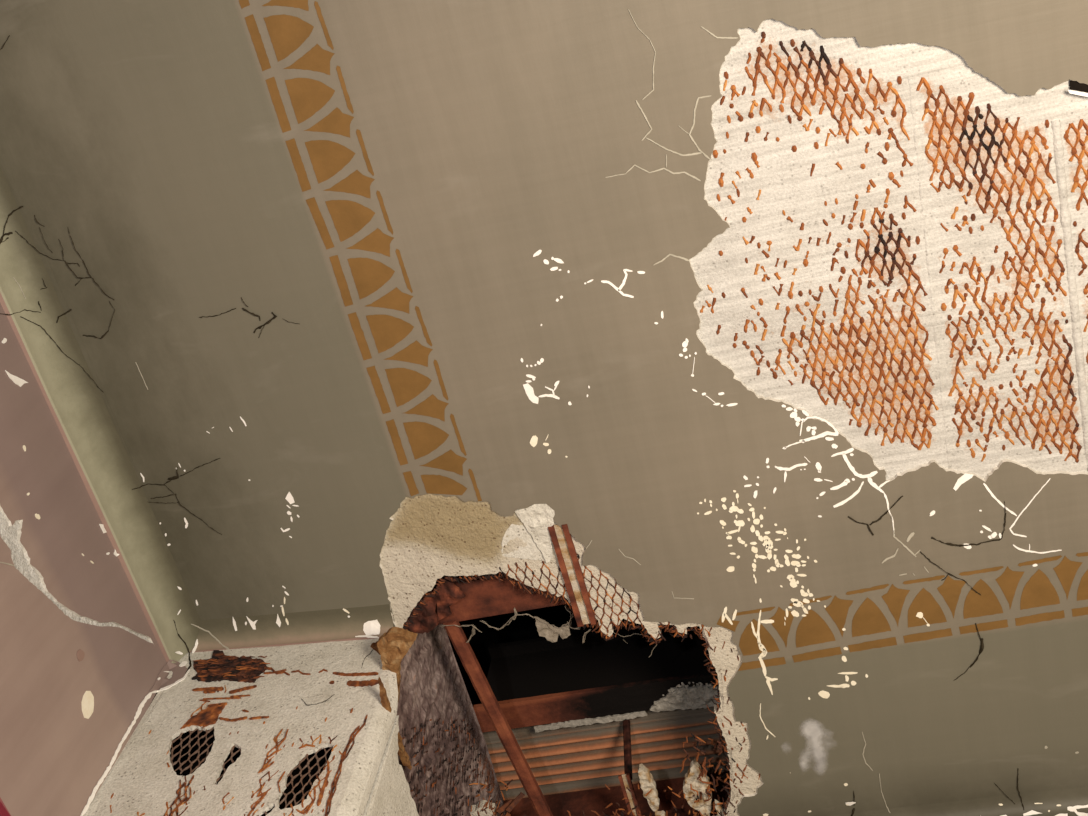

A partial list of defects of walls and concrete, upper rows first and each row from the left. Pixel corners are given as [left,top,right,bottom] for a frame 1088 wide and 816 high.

crack [606,9,711,181]
flaking render [679,19,1088,480]
crack [743,404,935,576]
crack [953,473,1062,567]
crack [0,511,151,643]
corrosion [180,650,378,729]
corrosion [164,775,194,816]
spalling [225,747,241,770]
corrosion [247,728,289,816]
spalling [261,747,333,816]
corrosion [296,761,330,814]
peeling [1023,803,1088,816]